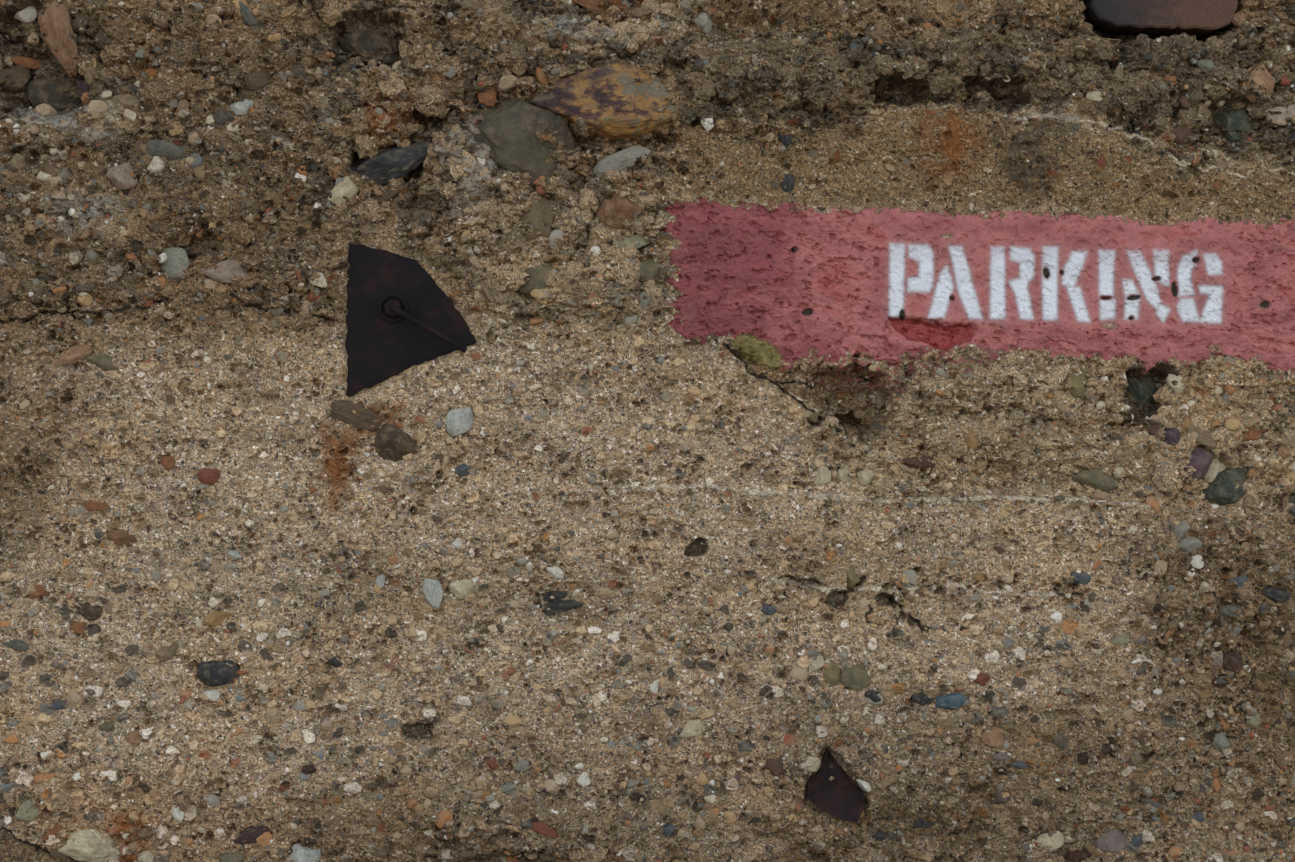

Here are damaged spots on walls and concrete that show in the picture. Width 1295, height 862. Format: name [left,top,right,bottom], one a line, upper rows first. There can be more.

corrosion [323,408,397,510]